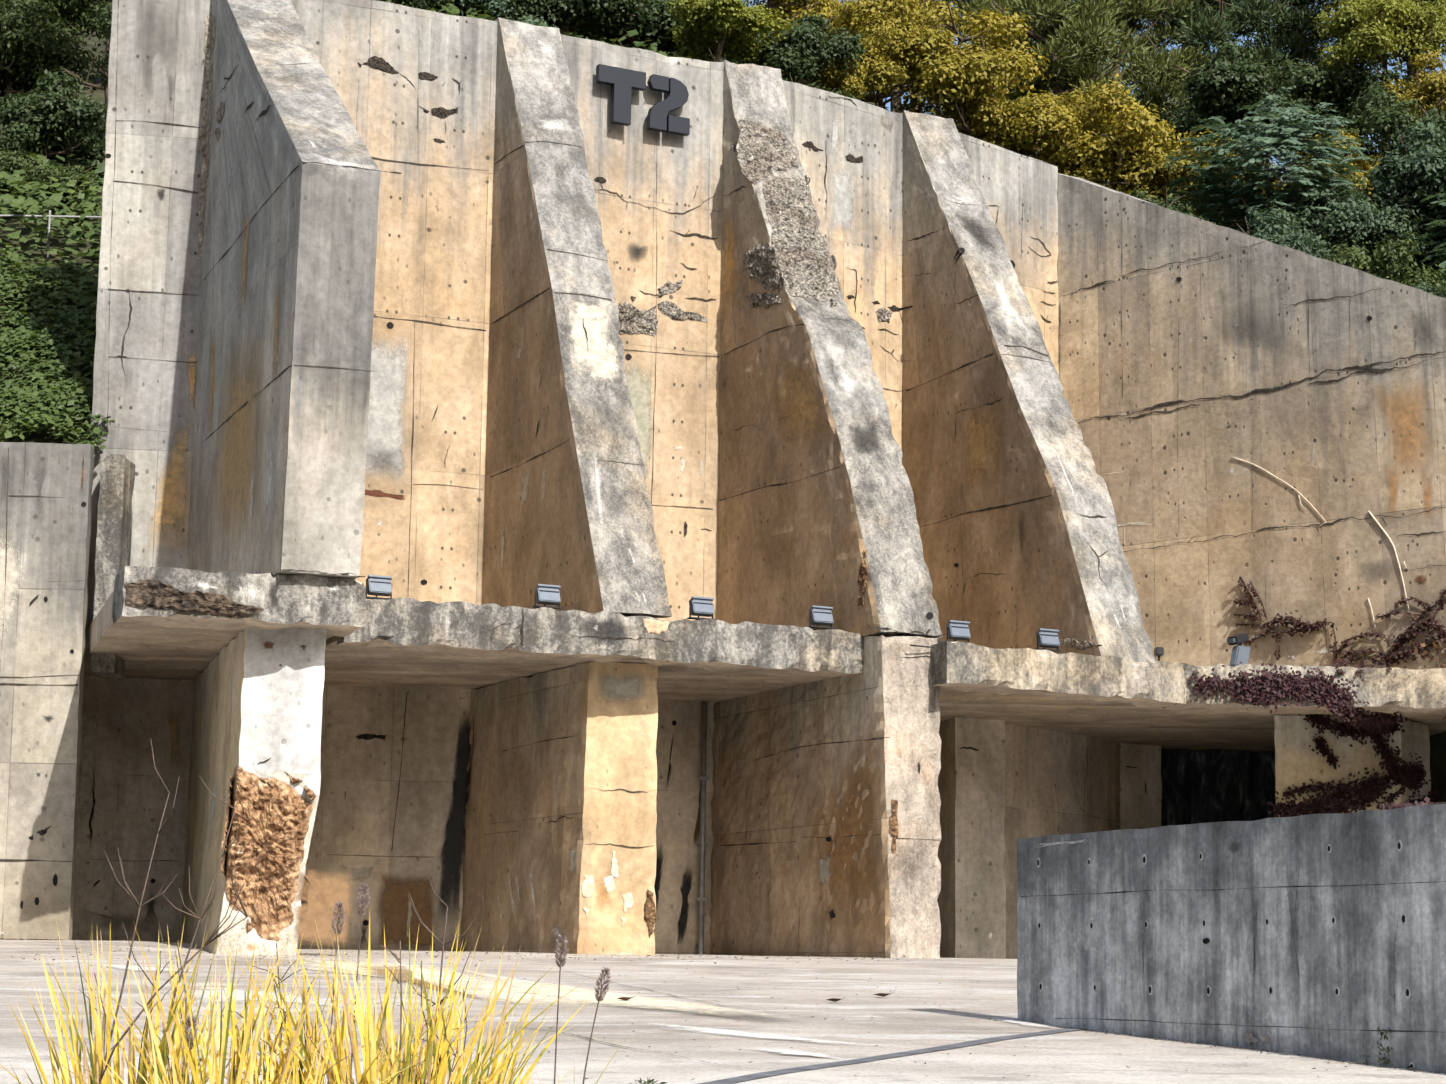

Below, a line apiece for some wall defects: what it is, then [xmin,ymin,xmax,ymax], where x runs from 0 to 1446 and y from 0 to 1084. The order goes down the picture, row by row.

spalling [358,56,399,74]
spalling [731,117,855,310]
peeling [570,280,708,378]
crack [1029,236,1264,323]
crack [1285,288,1382,306]
crack [1079,351,1445,423]
crack [1077,507,1446,586]
spalling [123,579,264,619]
spalling [221,766,316,941]
water stain [440,719,474,912]
water stain [654,851,662,909]
water stain [678,872,692,940]